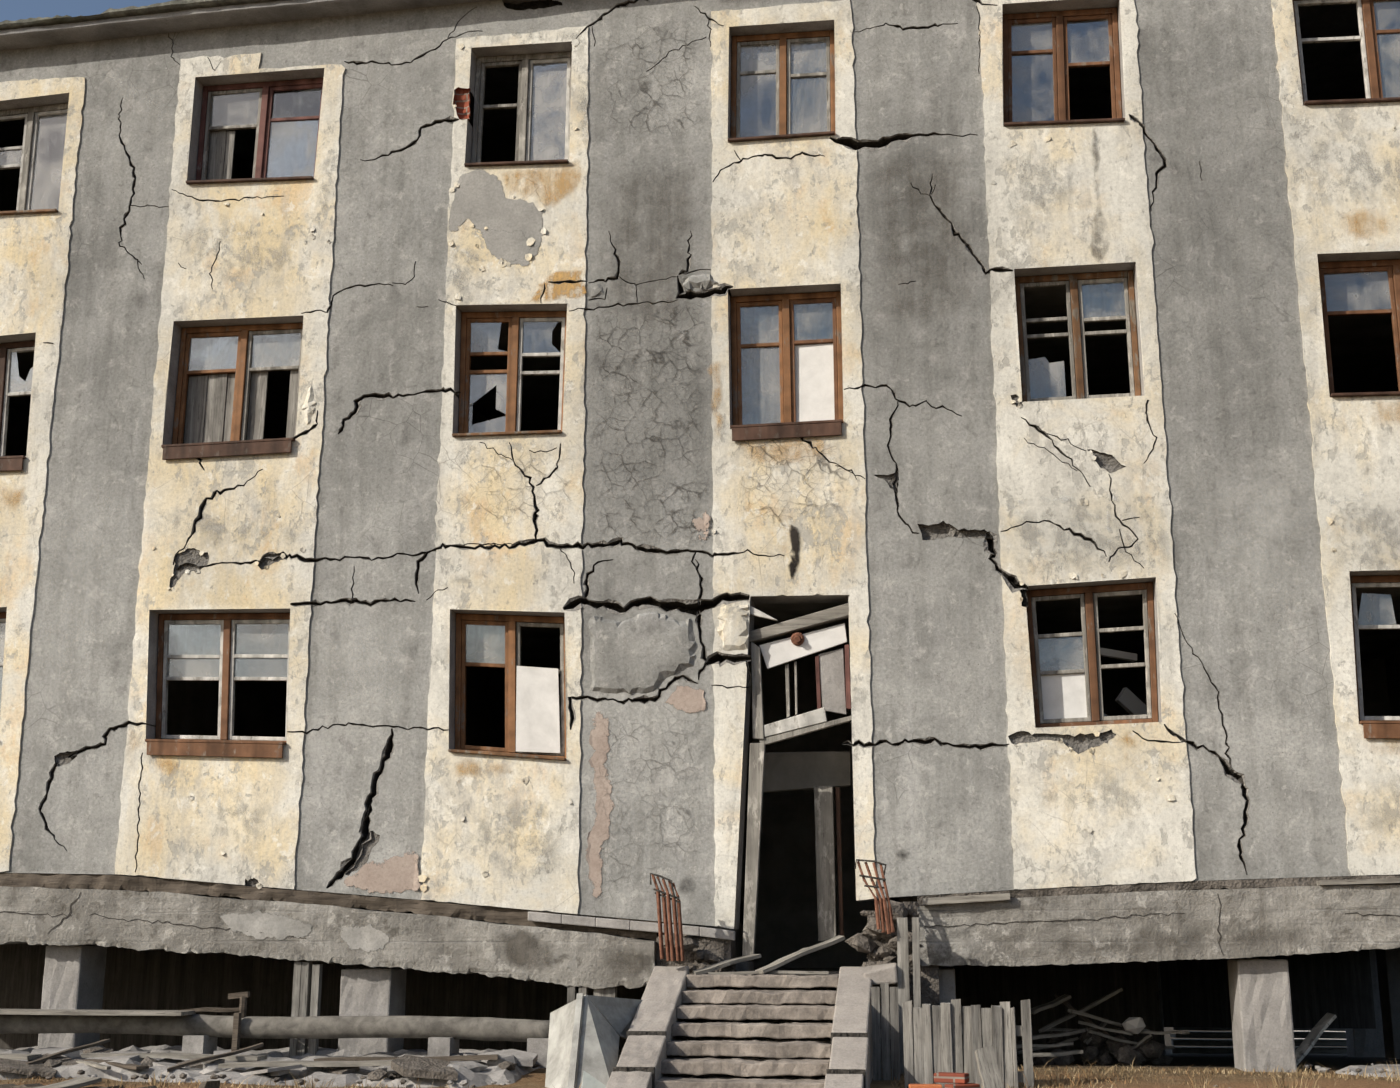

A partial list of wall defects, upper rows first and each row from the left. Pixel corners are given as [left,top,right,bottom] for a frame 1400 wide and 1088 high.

crack [118,97,281,278]
spalling [453,87,471,120]
peeling [448,169,546,300]
crack [713,132,977,182]
crack [911,174,1013,275]
spalling [167,548,209,590]
crack [173,231,785,730]
crack [750,384,961,534]
crack [983,417,1144,593]
crack [38,720,148,872]
crack [287,722,449,888]
crack [1133,613,1250,875]